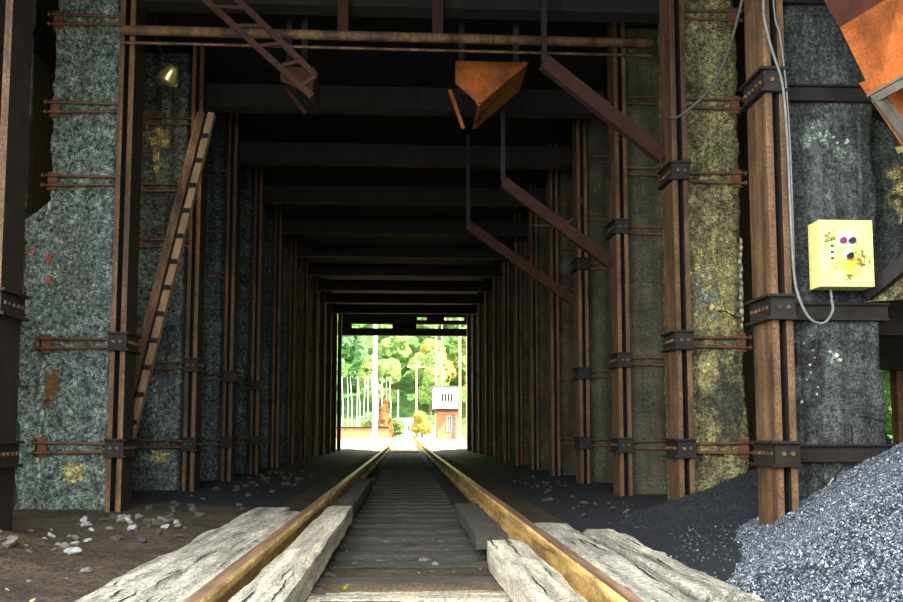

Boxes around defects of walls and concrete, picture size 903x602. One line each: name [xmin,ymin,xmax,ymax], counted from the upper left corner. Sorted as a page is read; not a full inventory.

damp [887,168,903,216]
damp [690,234,732,329]
corrosion [45,370,58,406]